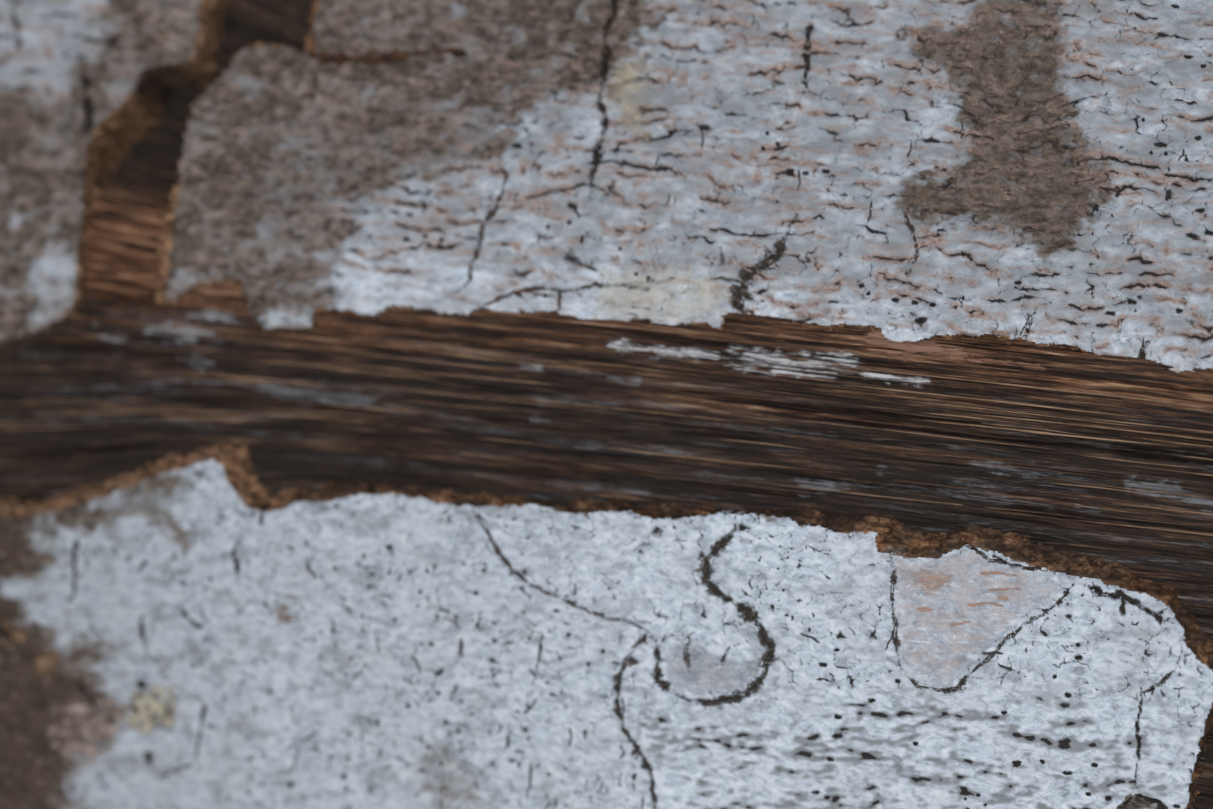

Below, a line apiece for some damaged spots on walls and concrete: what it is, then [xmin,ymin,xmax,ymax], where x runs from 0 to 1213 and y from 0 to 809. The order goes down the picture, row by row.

crack [10,0,22,52]
crack [589,0,618,199]
crack [727,213,798,313]
crack [966,546,1047,571]
crack [473,511,776,809]
crack [889,554,1183,809]
peeling [1116,794,1156,809]